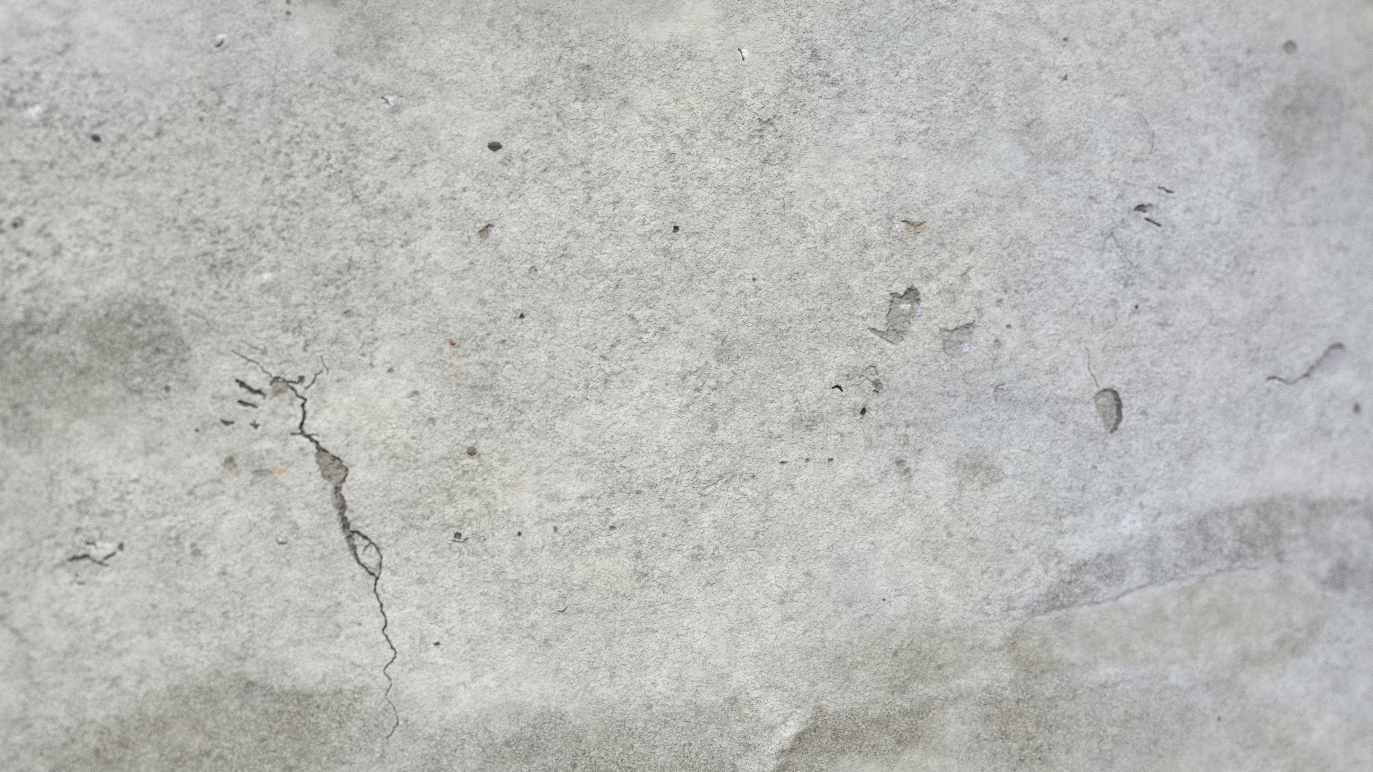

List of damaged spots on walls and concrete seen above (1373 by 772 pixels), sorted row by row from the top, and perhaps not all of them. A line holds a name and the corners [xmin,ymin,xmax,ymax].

hole [1079,340,1129,440]
crack [1262,339,1352,389]
crack [155,289,404,745]